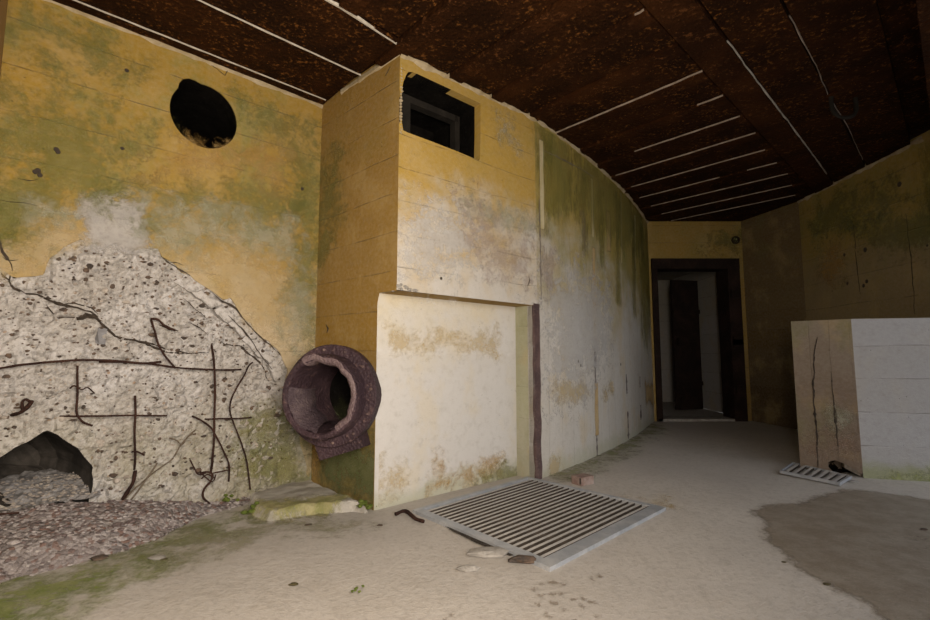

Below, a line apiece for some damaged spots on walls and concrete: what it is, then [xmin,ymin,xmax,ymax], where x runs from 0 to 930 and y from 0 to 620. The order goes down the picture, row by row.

damp [73,0,326,101]
damp [74,191,149,252]
damp [539,140,550,230]
spalling [0,240,311,515]
crack [812,337,839,466]